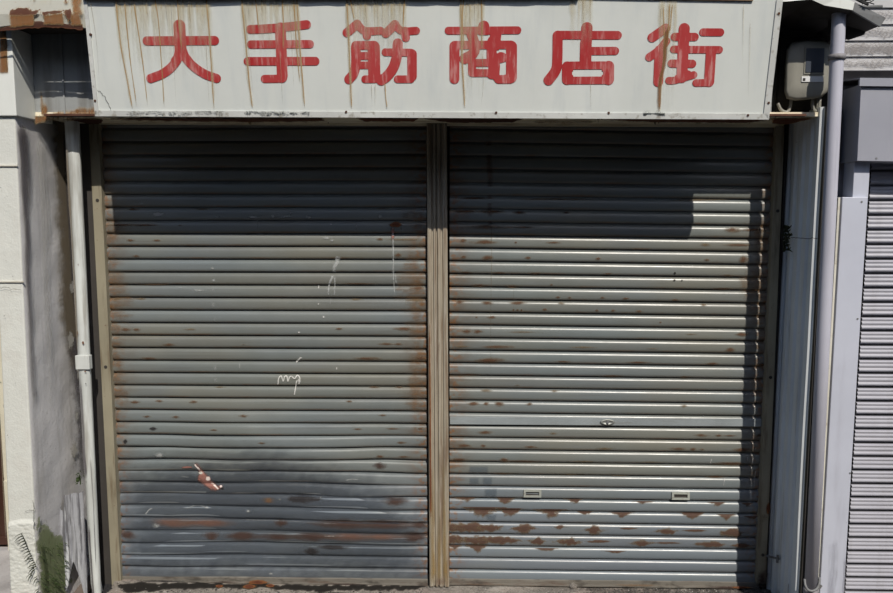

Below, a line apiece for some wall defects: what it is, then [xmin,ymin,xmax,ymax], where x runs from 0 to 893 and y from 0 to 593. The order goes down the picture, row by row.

rust [115,1,147,105]
rust [241,1,253,107]
rust [282,0,305,105]
water stain [18,126,33,356]
water stain [52,120,92,479]
rust [230,335,623,578]
rust [633,502,770,548]